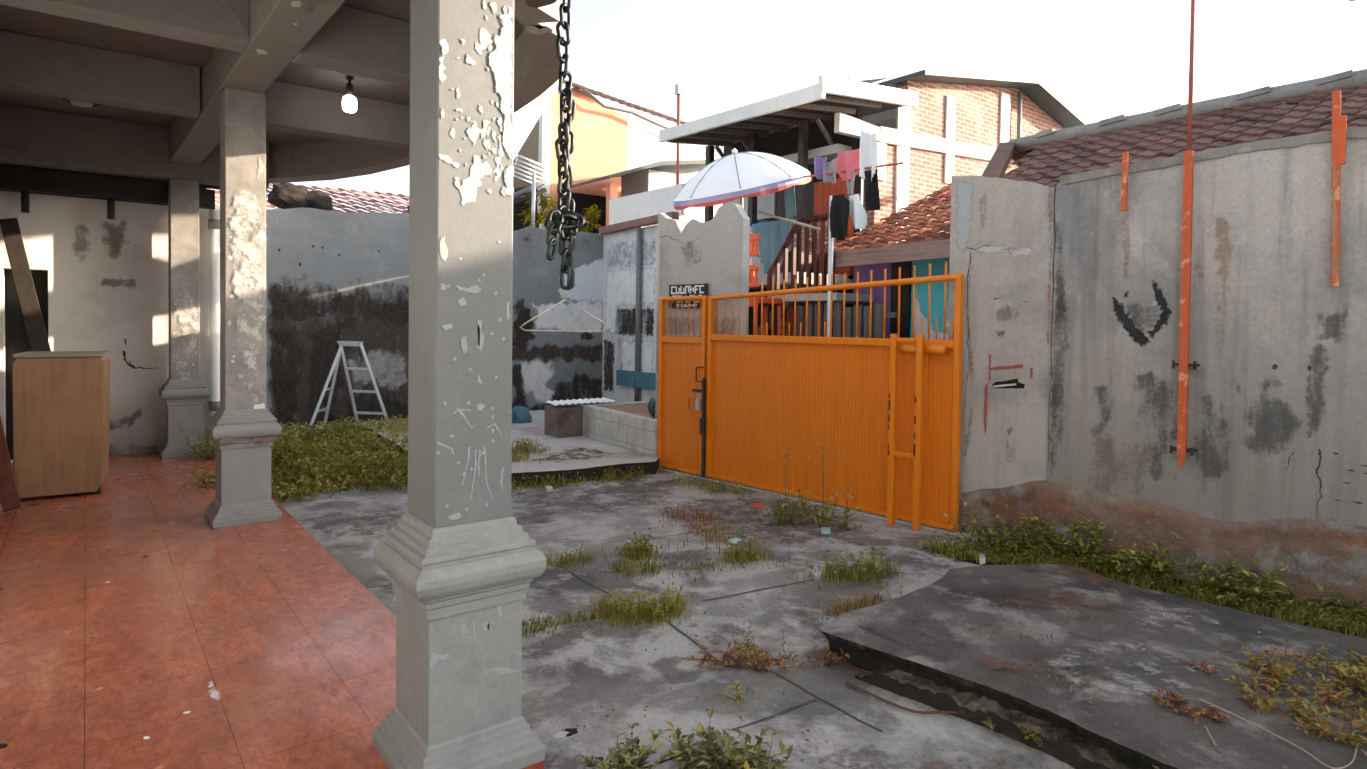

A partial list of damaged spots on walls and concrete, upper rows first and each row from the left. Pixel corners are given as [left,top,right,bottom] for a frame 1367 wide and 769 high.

peeling [227,156,280,409]
damp [266,284,409,427]
peeling [440,236,462,262]
peeling [441,273,511,383]
damp [1248,311,1347,452]
peeling [436,401,505,520]